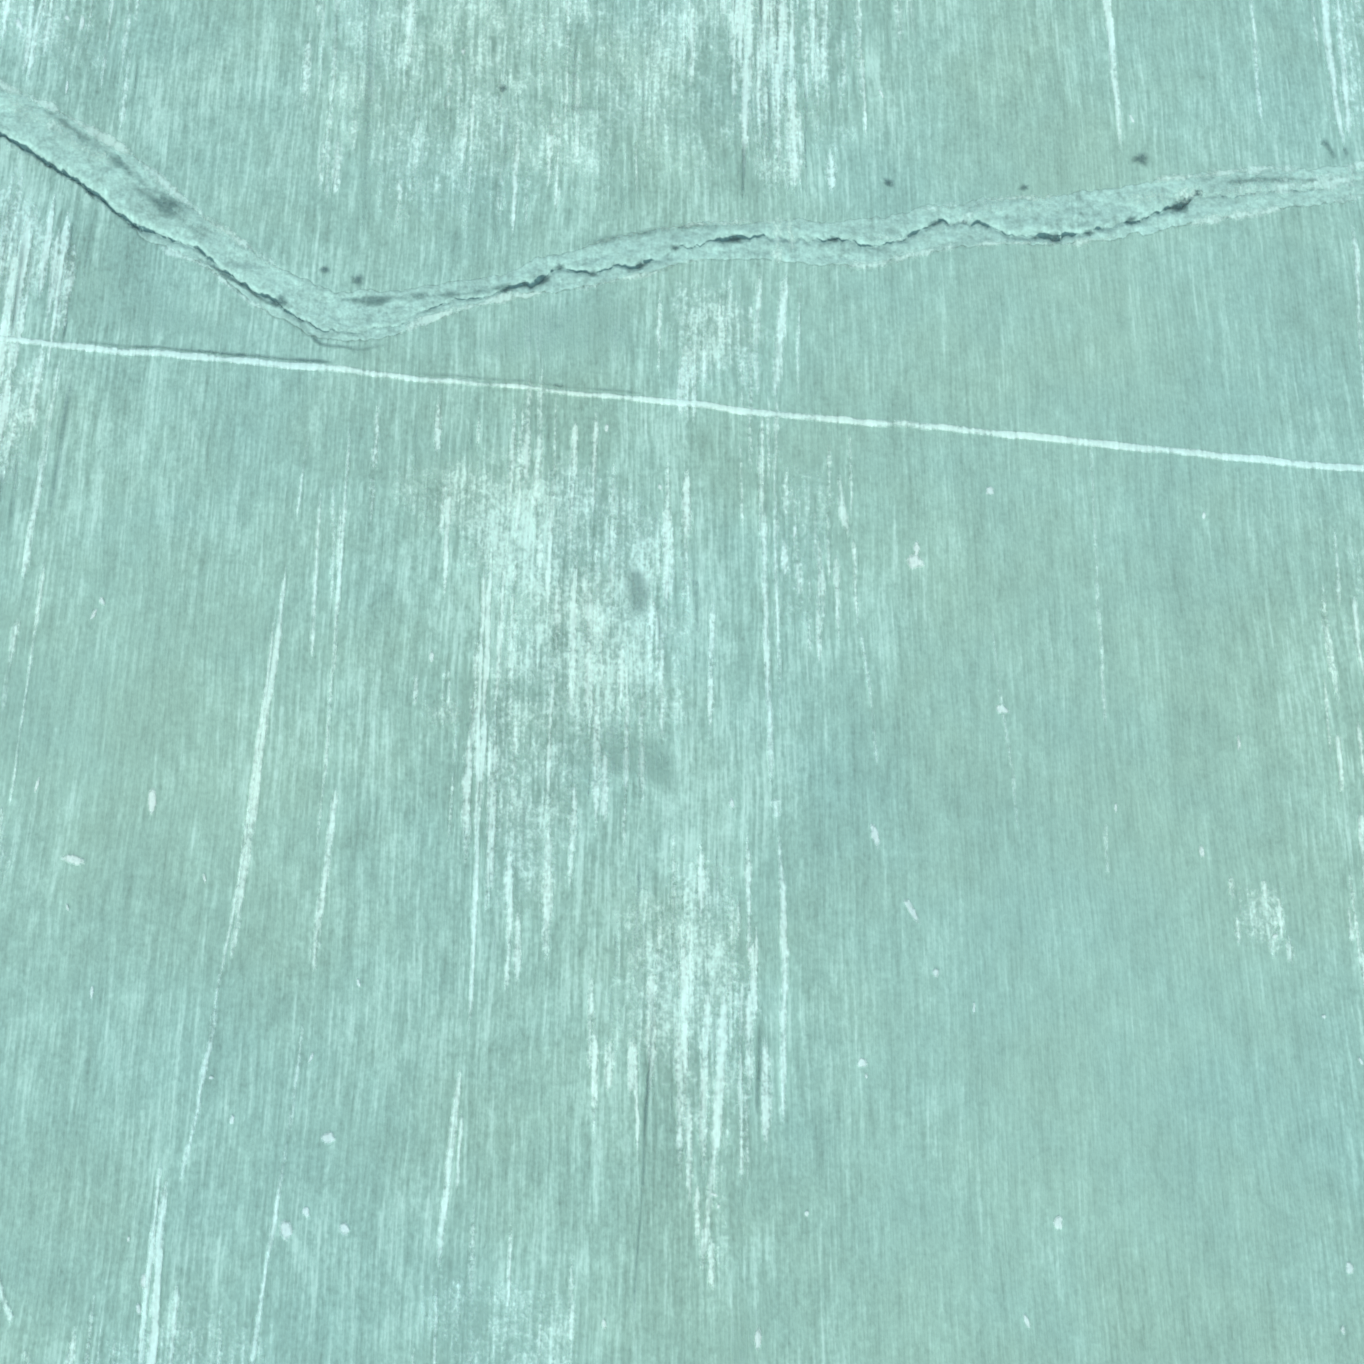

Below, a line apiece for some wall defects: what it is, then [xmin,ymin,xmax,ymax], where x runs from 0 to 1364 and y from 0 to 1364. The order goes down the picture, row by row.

crack [0,80,1364,342]